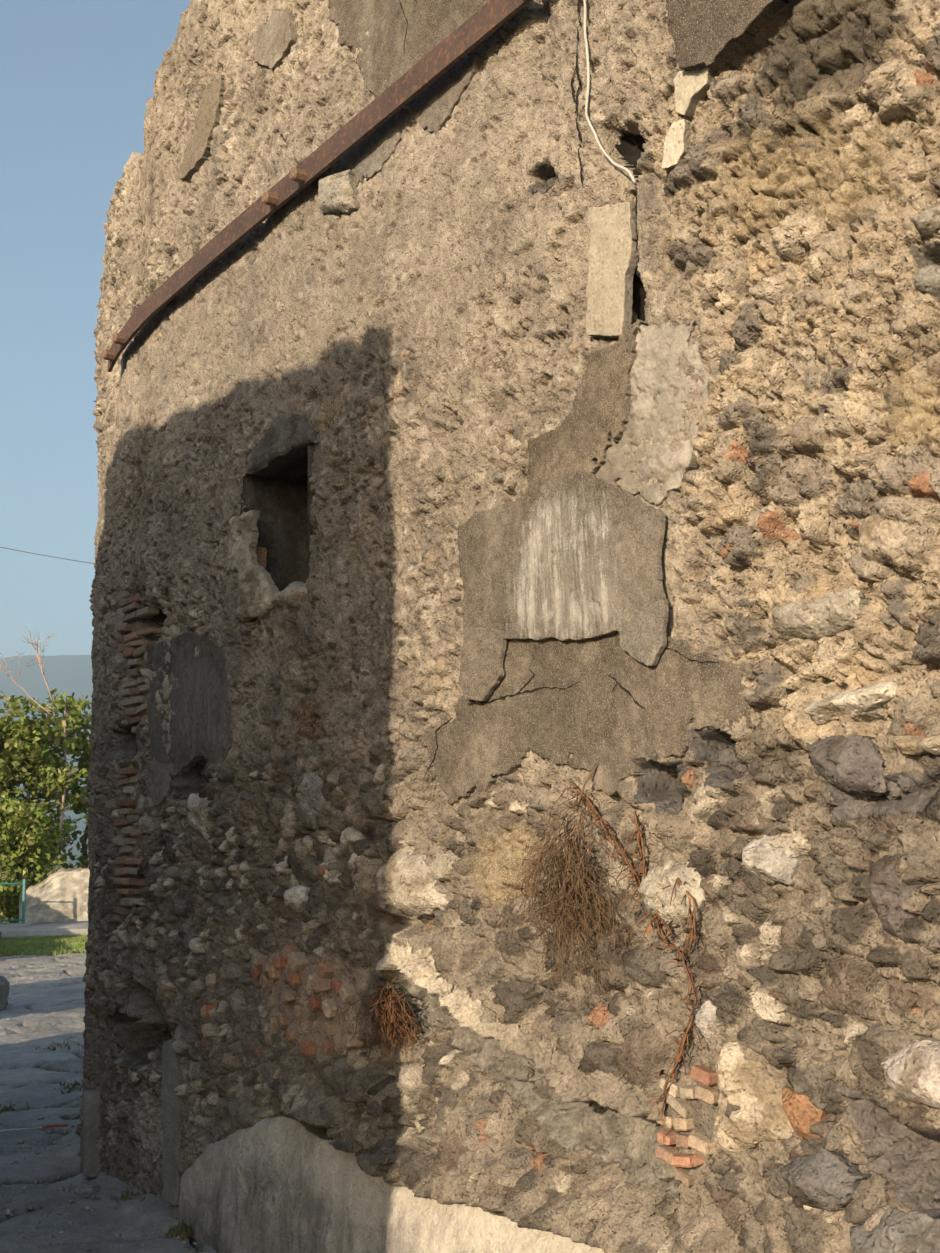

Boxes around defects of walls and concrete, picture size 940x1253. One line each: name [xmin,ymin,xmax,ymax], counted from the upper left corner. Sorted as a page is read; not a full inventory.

crack [571,0,583,187]
crack [615,130,647,321]
spalling [909,239,940,297]
crack [424,669,645,778]
spalling [825,766,940,822]
flaking render [251,944,364,1056]
peeling [110,977,604,1253]
spalling [386,979,719,1200]
spalling [833,1085,940,1211]